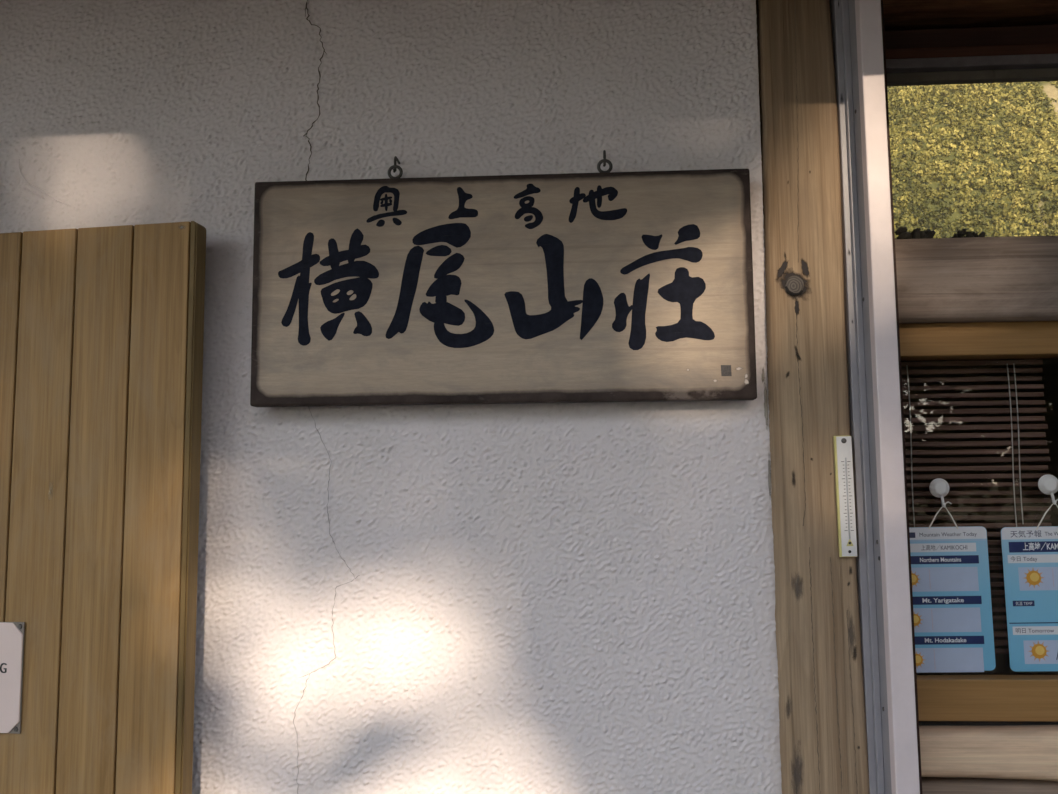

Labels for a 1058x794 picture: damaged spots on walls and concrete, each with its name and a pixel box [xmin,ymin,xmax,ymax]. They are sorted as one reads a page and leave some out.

crack [304,0,326,181]
crack [293,409,360,793]